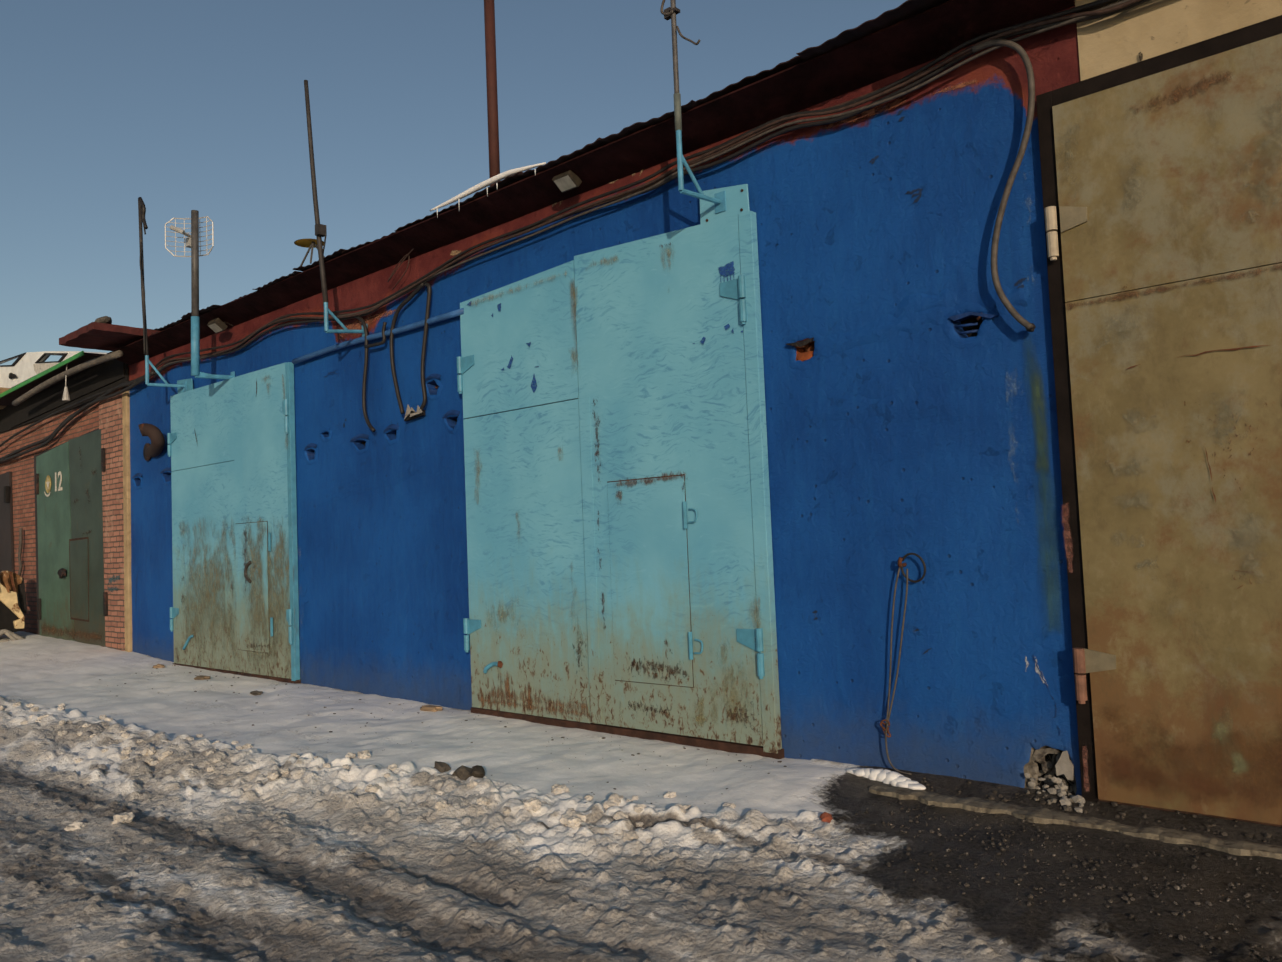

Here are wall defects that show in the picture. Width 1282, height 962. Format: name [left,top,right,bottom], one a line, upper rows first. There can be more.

peeling [339,310,395,337]
rust [616,473,685,501]
rust [631,640,687,681]
rust [478,674,588,718]
flaking render [1014,736,1082,796]